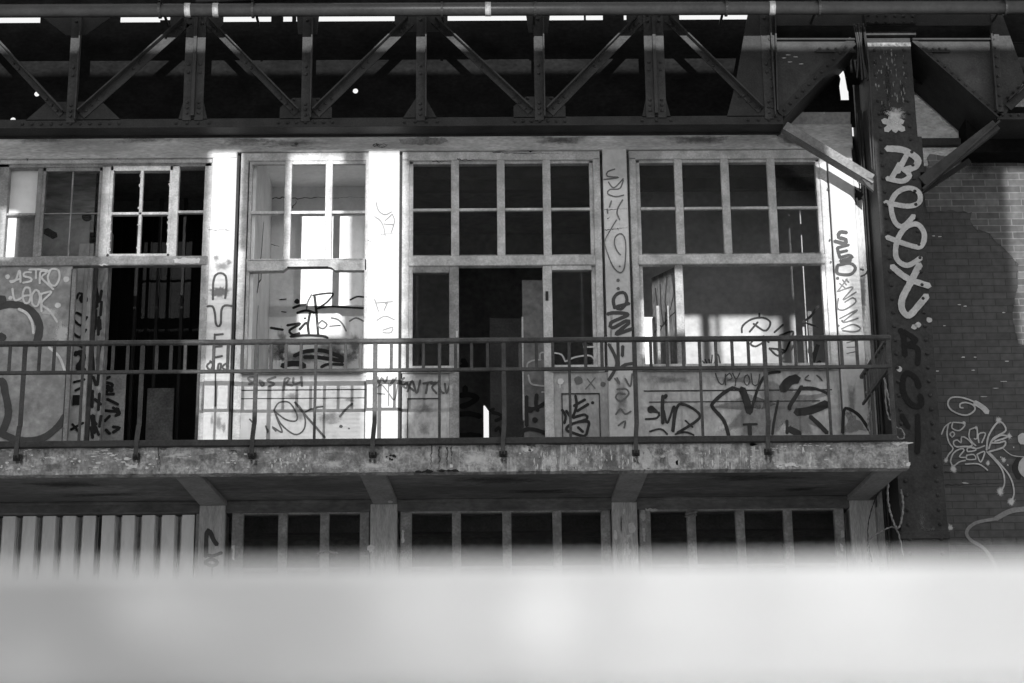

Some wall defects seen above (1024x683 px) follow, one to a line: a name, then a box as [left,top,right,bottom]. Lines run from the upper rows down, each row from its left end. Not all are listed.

peeling [924,154,1024,345]